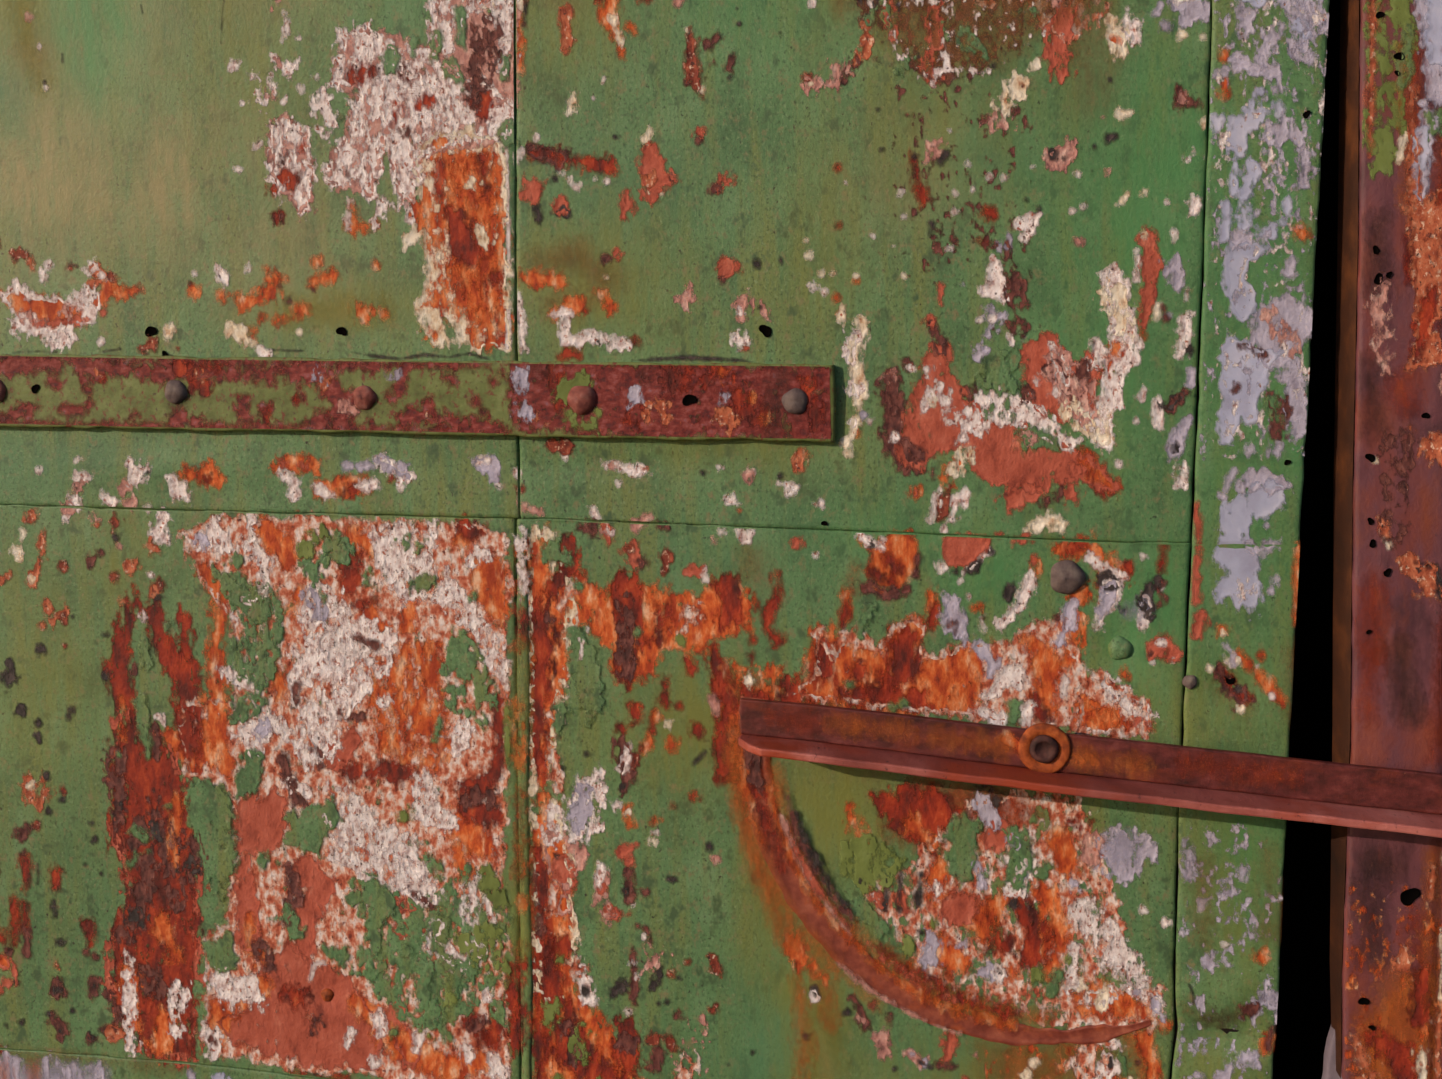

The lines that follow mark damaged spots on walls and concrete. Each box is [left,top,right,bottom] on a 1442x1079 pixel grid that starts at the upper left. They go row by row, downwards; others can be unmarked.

peeling [0,246,145,354]
peeling [227,0,525,267]
rust [0,124,831,439]
peeling [619,127,677,220]
peeling [800,0,1329,665]
rust [1364,75,1442,412]
rust [1373,426,1442,601]
rust [80,583,221,1070]
peeling [59,451,523,1079]
peeling [540,734,723,1079]
rust [509,524,1167,1079]
rust [1344,856,1442,1079]